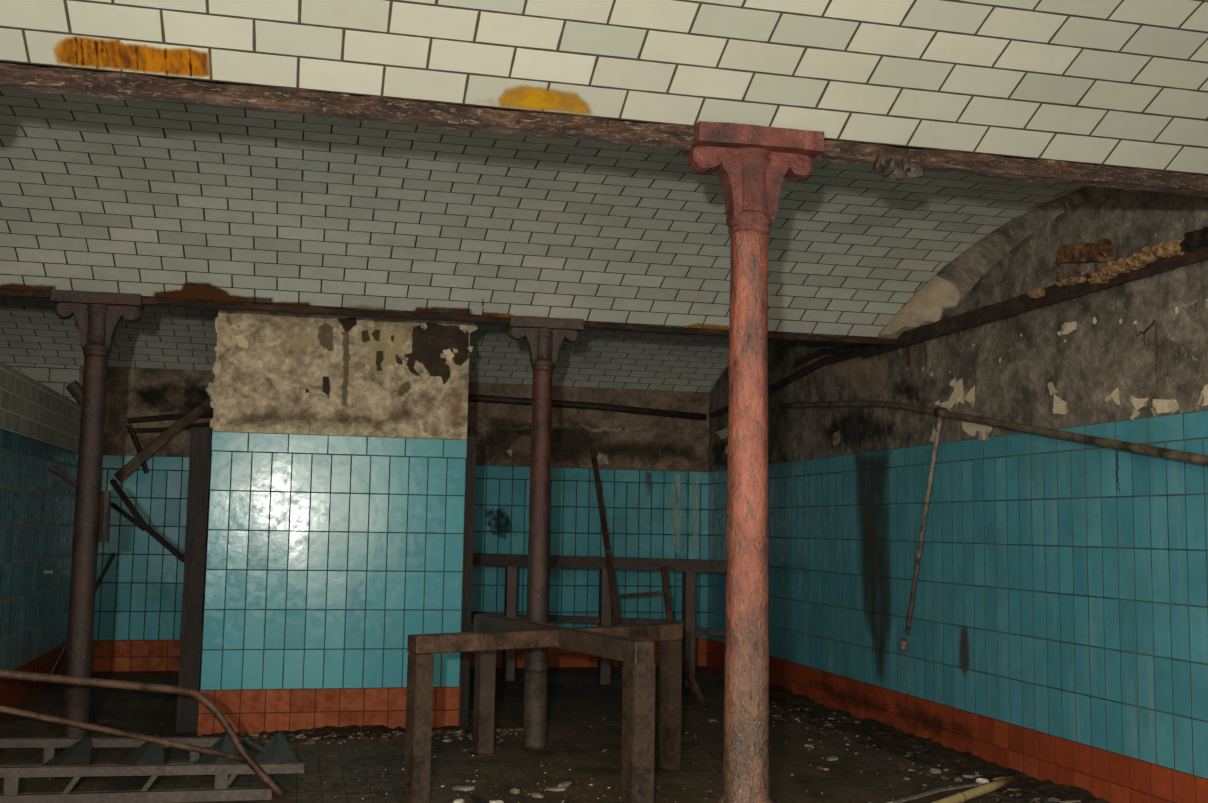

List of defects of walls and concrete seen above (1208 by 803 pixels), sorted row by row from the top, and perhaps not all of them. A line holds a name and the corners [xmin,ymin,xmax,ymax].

rust [55,37,209,77]
rust [499,87,589,113]
rust [0,284,55,292]
flaking render [318,323,333,351]
peeling [1057,321,1077,342]
flaking render [362,321,477,396]
flaking render [305,376,330,397]
peeling [935,371,992,441]
peeling [1048,381,1069,414]
peeling [1105,387,1179,420]
peeling [1197,384,1208,407]
damp [828,414,893,671]